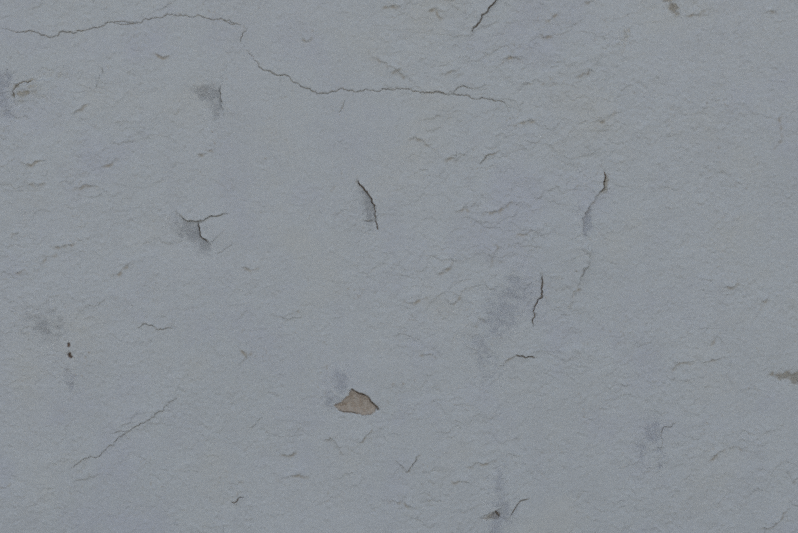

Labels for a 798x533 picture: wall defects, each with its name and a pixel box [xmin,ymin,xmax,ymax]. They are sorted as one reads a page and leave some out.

spalling [334,384,380,415]